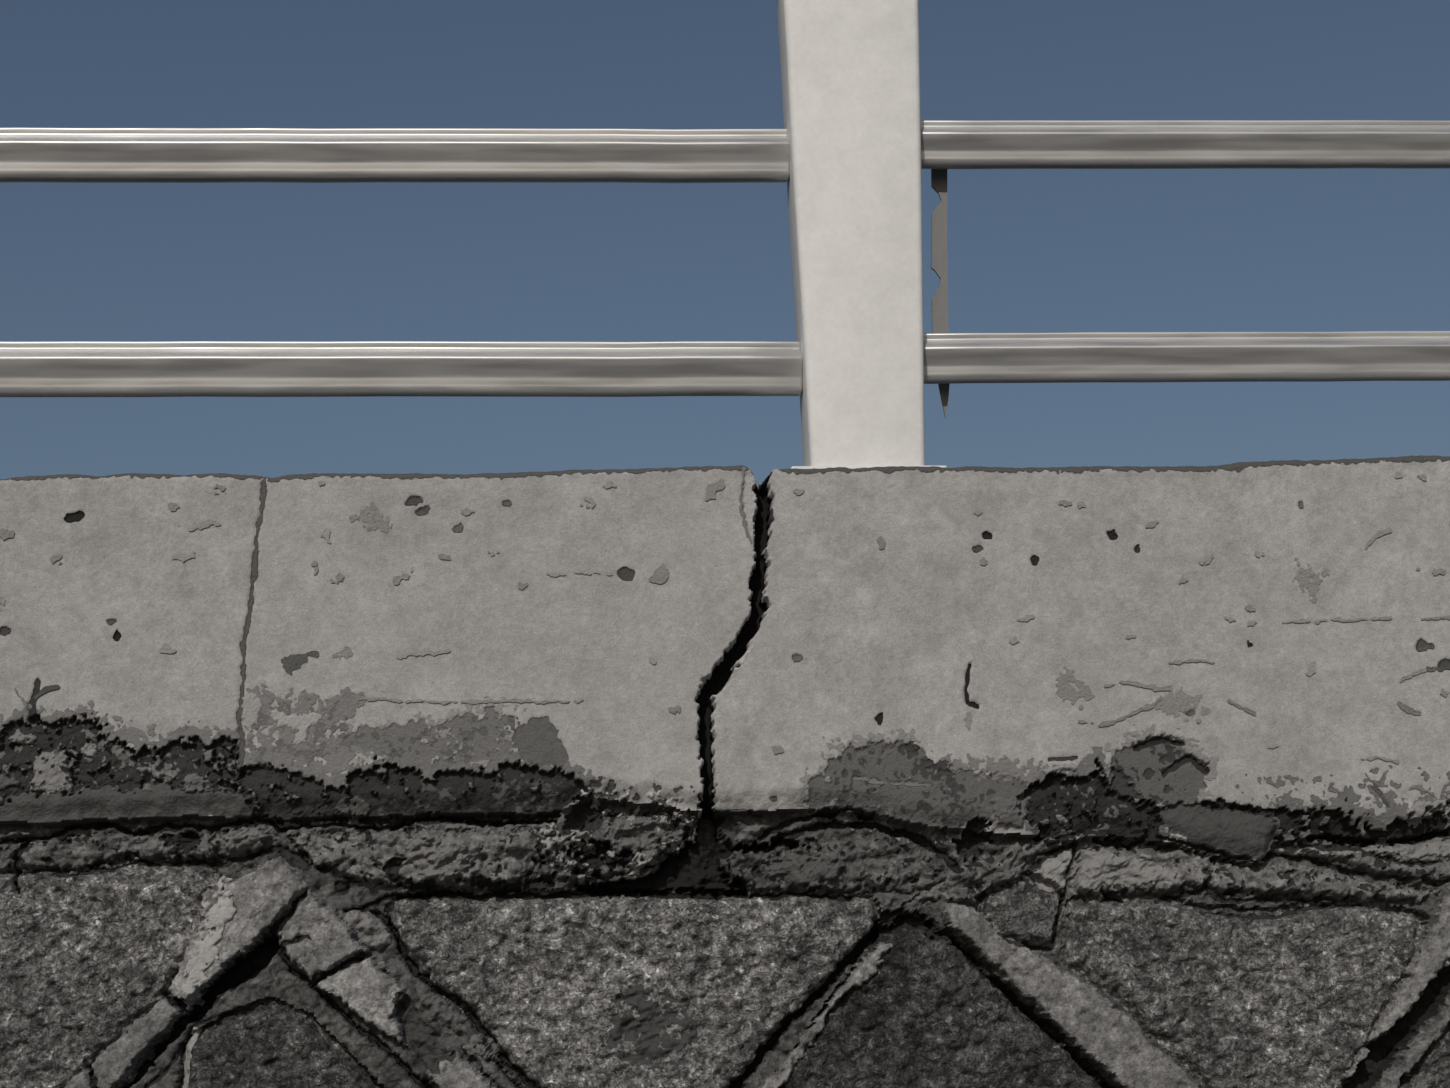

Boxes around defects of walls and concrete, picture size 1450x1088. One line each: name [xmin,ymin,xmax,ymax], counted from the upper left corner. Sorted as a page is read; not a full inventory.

crack [357,697,583,705]
crack [696,467,965,874]
spalling [803,734,1450,901]
spalling [191,936,280,1023]
spalling [392,992,456,1074]
crack [83,889,852,1088]
crack [728,926,879,1088]
spalling [872,907,946,942]
spalling [1342,965,1450,1088]